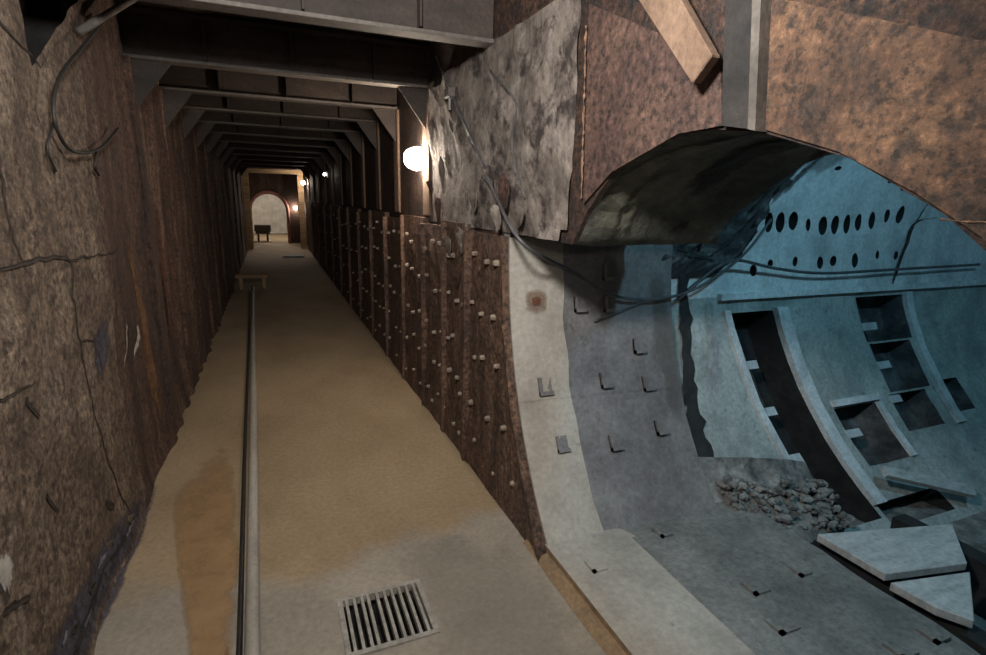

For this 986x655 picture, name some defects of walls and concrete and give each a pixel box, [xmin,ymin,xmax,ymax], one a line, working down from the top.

crack [0,21,42,68]
crack [0,158,134,518]
damp [50,494,154,655]